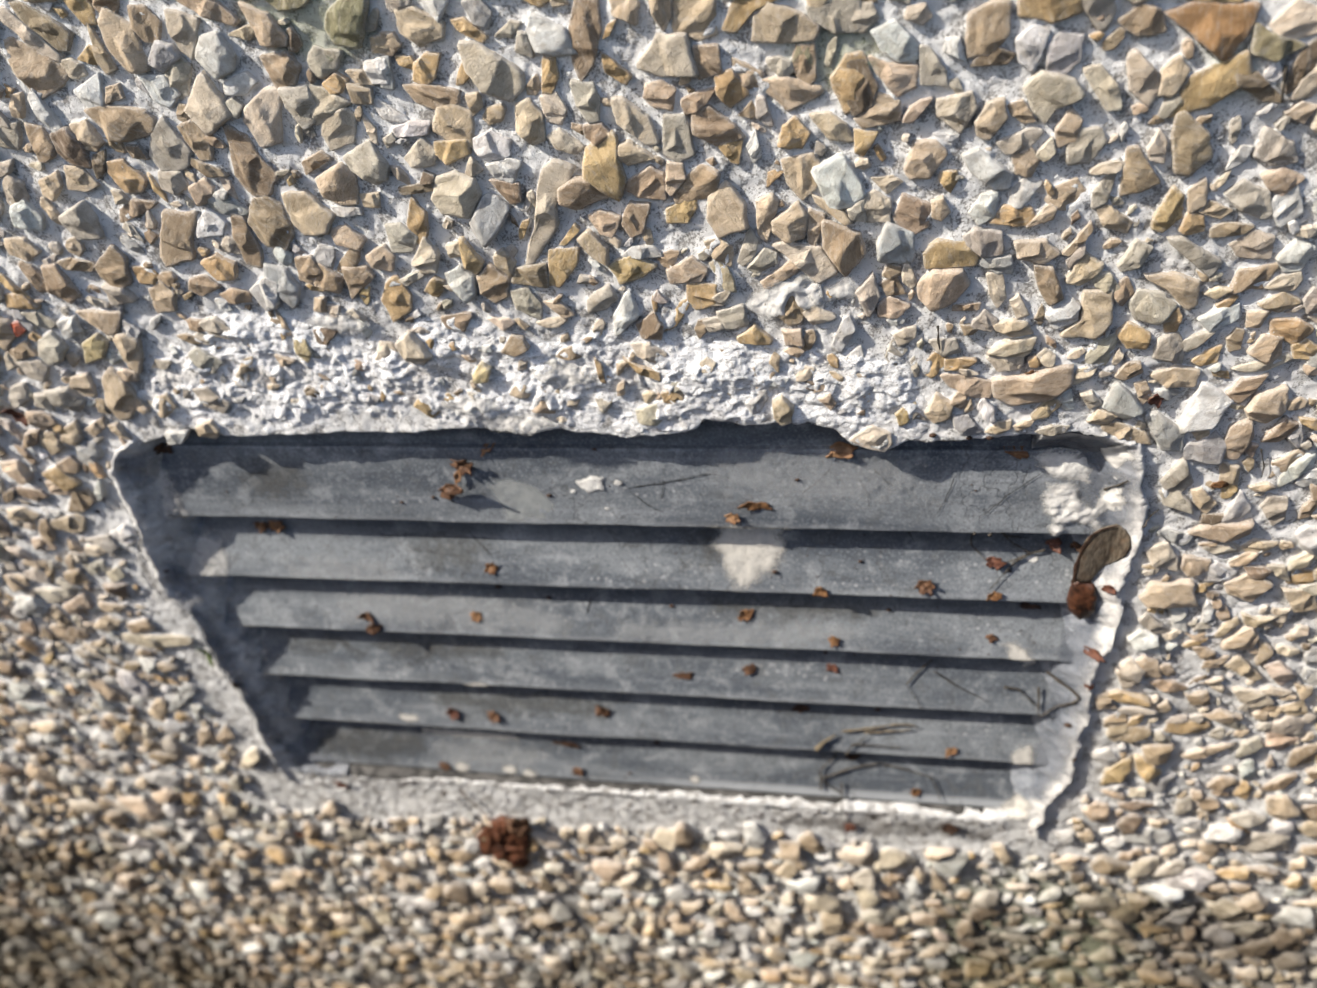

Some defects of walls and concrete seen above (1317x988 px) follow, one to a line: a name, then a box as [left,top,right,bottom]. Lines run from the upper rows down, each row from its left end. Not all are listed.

water stain [1032,434,1141,533]